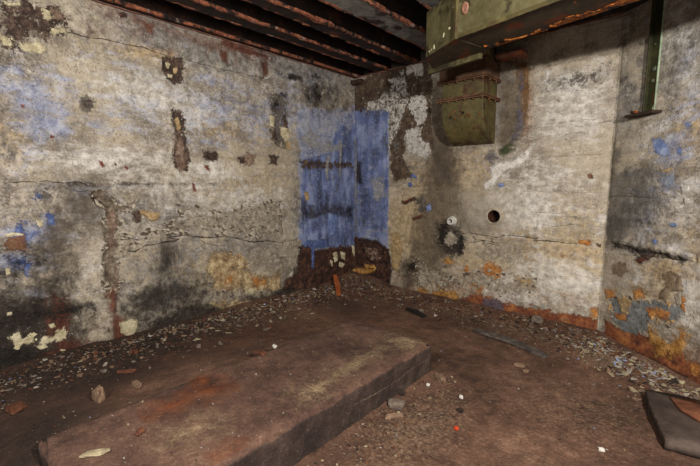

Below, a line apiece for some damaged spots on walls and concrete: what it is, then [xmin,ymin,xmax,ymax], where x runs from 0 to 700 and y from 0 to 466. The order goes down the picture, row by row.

corrosion [106,0,426,78]
corrosion [484,0,638,50]
peeling [354,62,435,187]
crack [12,180,96,192]
damp [388,88,460,285]
spalling [90,189,282,313]
crack [120,202,296,252]
crack [614,243,696,263]
peeling [7,323,68,351]
damp [0,273,96,368]
damp [129,280,220,330]
corrosion [418,282,700,384]